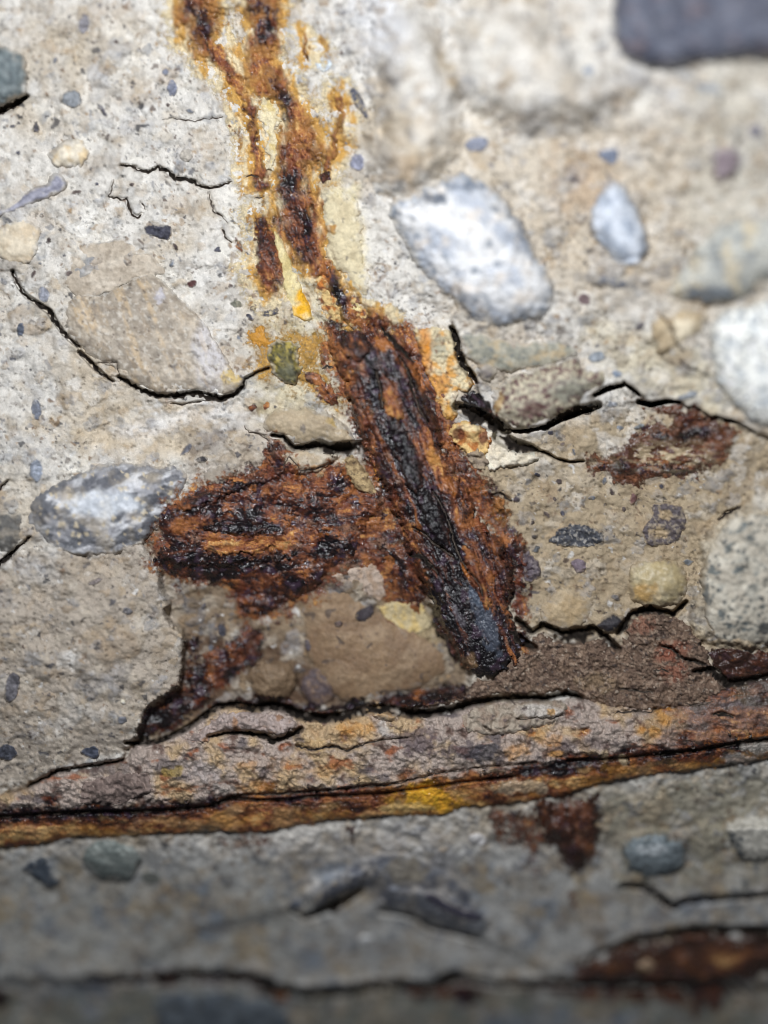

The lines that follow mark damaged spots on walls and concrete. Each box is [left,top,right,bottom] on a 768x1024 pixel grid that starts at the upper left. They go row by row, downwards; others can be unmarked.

crack [108,165,264,243]
crack [11,270,269,406]
rust [160,0,533,676]
crack [451,328,680,462]
crack [244,425,360,474]
rust [585,396,748,489]
spalling [4,671,20,703]
rust [0,431,768,876]
spalling [411,612,726,711]
crack [508,602,687,650]
spalling [0,743,18,761]
spalling [80,746,100,759]